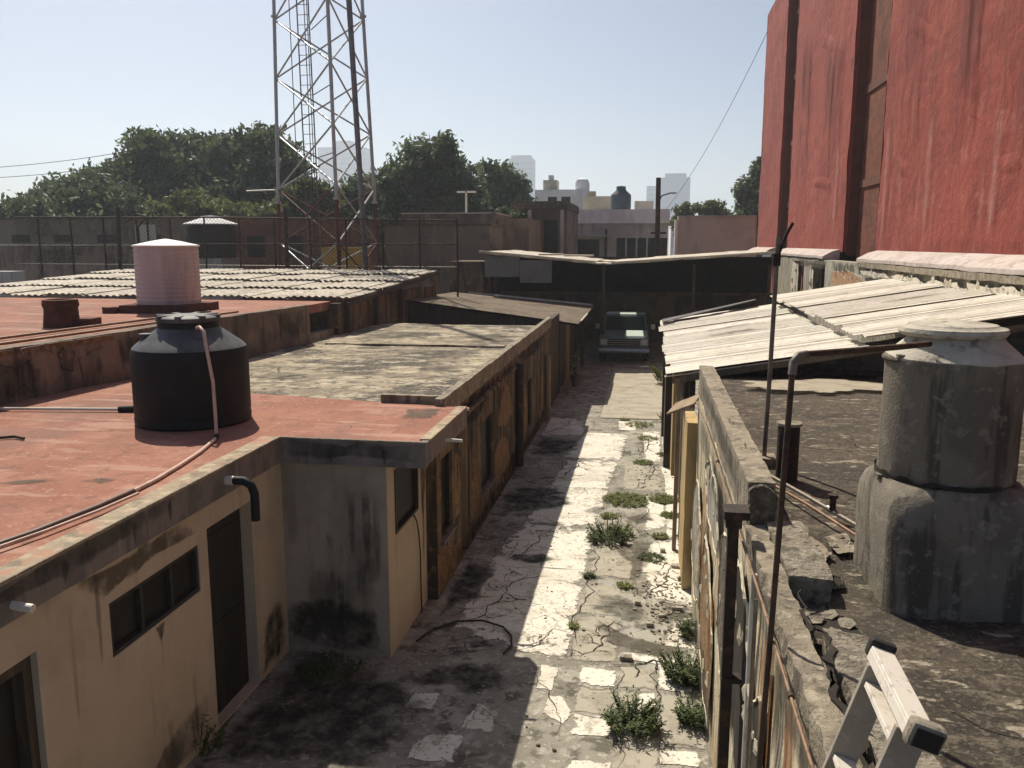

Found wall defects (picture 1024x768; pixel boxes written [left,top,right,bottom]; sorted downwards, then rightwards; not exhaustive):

crack [524,459,598,493]
crack [635,437,661,532]
spalling [748,484,778,526]
water stain [87,532,185,593]
water stain [265,600,372,668]
crack [426,523,725,768]
crack [797,589,848,713]
corrosion [757,635,774,768]
corrosion [784,701,796,768]